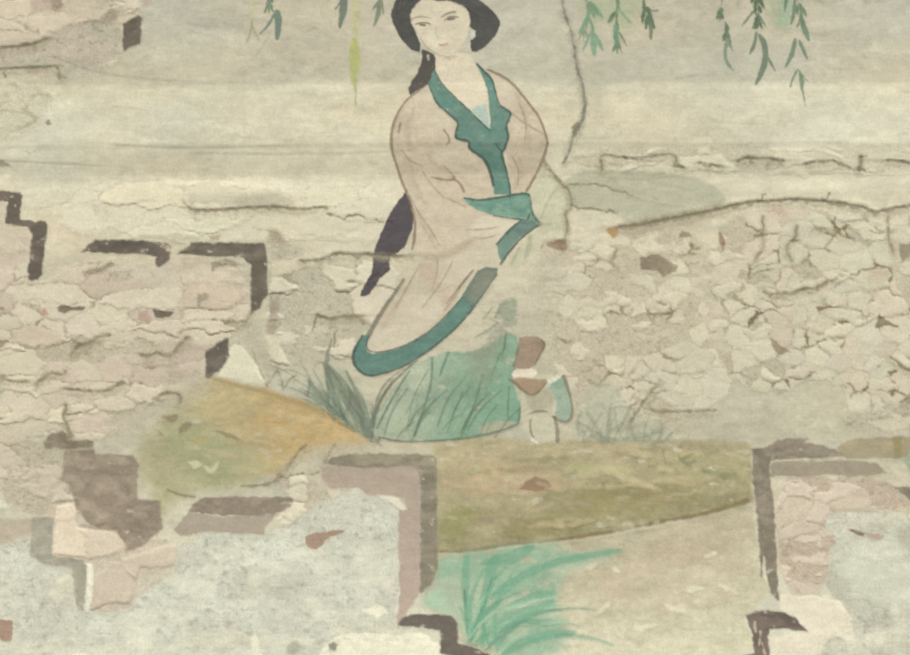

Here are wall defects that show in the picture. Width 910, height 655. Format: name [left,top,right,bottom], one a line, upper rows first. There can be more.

peeling [0,0,144,145]
crack [539,0,910,303]
peeling [571,143,910,179]
peeling [59,176,401,370]
peeling [0,257,440,655]
crack [626,376,719,432]
crack [884,353,910,410]